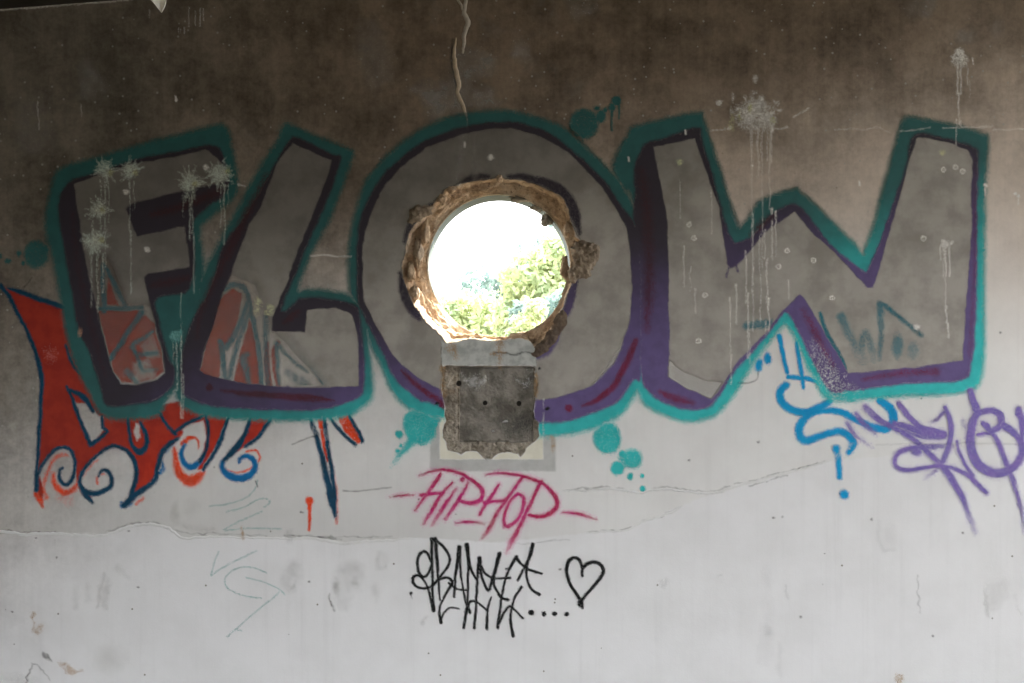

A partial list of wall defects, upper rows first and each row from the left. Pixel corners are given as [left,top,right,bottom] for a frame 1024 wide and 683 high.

crack [451,0,471,116]
spalling [402,175,600,460]